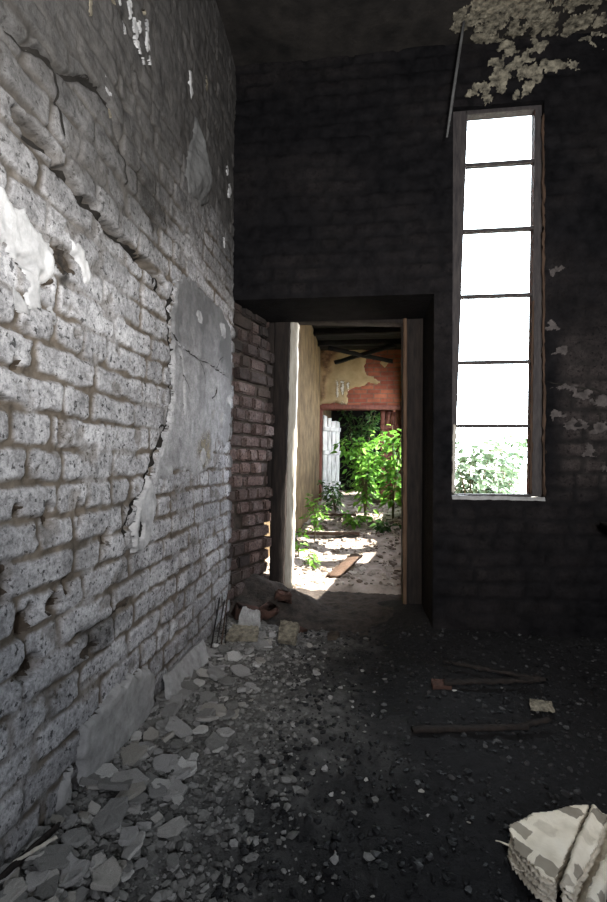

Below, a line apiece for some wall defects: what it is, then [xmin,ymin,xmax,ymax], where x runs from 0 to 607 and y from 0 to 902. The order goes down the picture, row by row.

peeling [111,0,152,65]
peeling [449,0,607,106]
spalling [21,135,45,154]
peeling [0,186,91,325]
spalling [72,192,140,262]
peeling [320,350,380,405]
crack [121,287,225,537]
spalling [10,659,30,682]
spalling [13,612,31,634]
spalling [44,573,69,616]
spalling [79,641,99,660]
peeling [55,666,155,812]